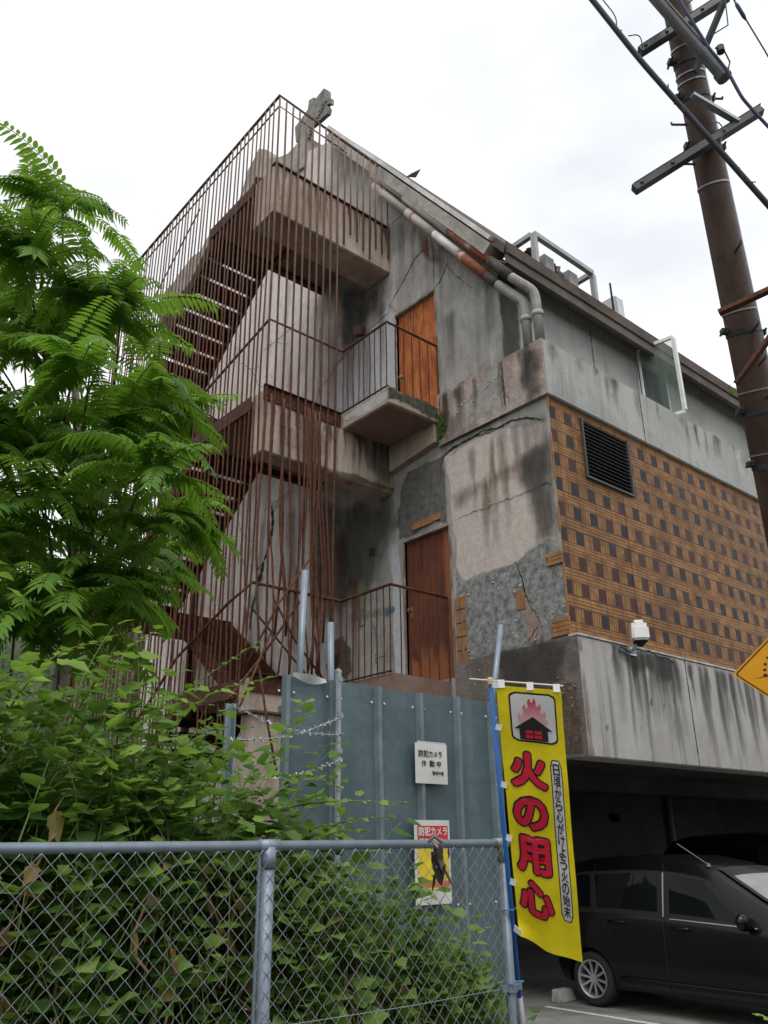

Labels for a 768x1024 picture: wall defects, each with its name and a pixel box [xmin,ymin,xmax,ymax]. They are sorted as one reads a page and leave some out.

crack [440,361,545,475]
crack [457,482,552,520]
peeling [391,422,567,674]
crack [516,563,539,645]
water stain [613,646,693,698]
water stain [706,669,762,715]